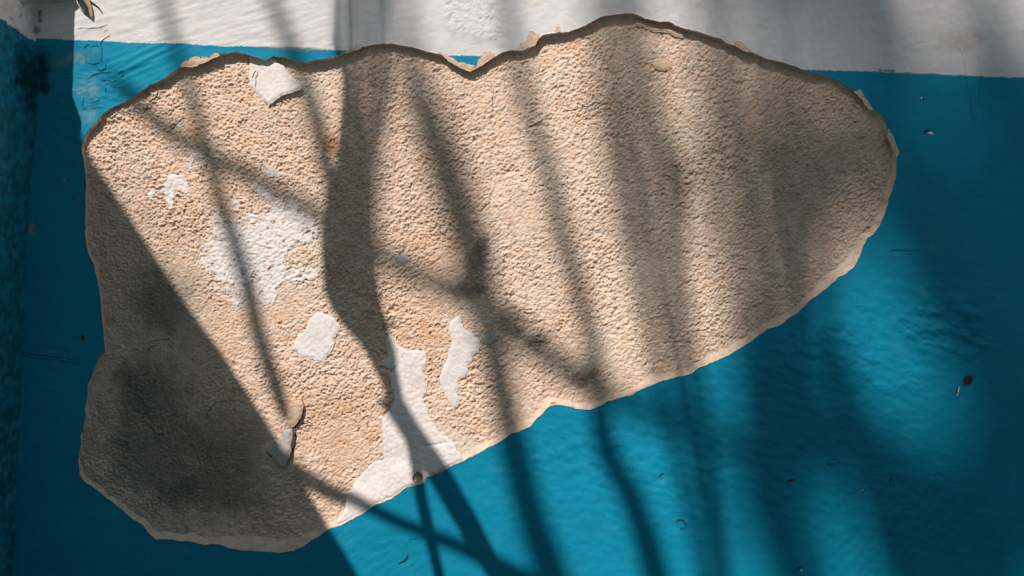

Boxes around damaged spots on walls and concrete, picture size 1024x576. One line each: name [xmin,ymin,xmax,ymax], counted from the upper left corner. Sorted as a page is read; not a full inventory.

crack [78,24,123,109]
flaking render [78,0,899,553]